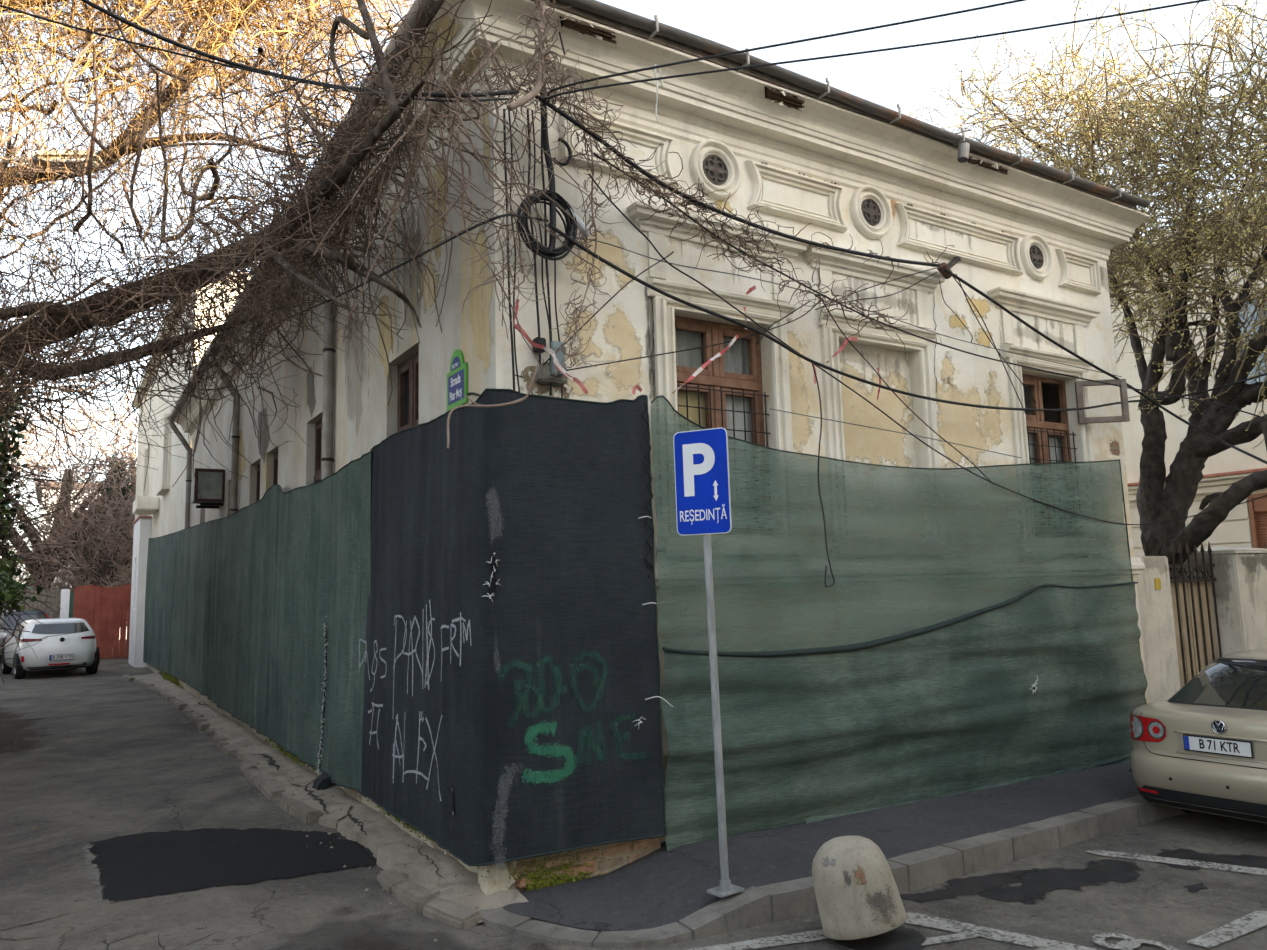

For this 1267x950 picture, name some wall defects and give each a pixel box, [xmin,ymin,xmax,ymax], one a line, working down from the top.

peeling [566,232,634,291]
peeling [522,306,642,399]
peeling [787,331,813,451]
peeling [935,351,1002,467]
peeling [950,298,992,348]